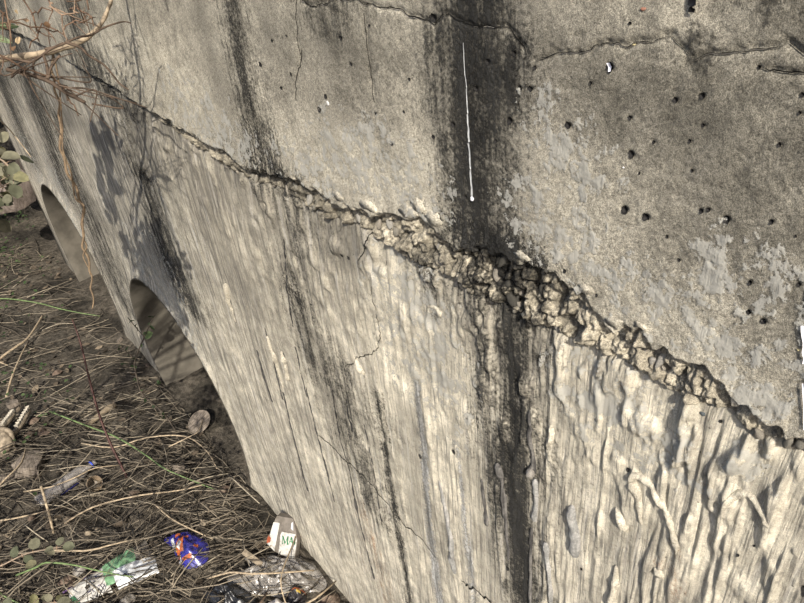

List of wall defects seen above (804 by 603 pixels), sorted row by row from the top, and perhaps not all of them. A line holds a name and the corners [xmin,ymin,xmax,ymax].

crack [295,0,804,100]
leakage [216,0,412,603]
crack [345,286,381,367]
leakage [403,232,445,321]
spalling [121,63,804,504]
leakage [413,0,576,603]
crack [321,437,436,558]